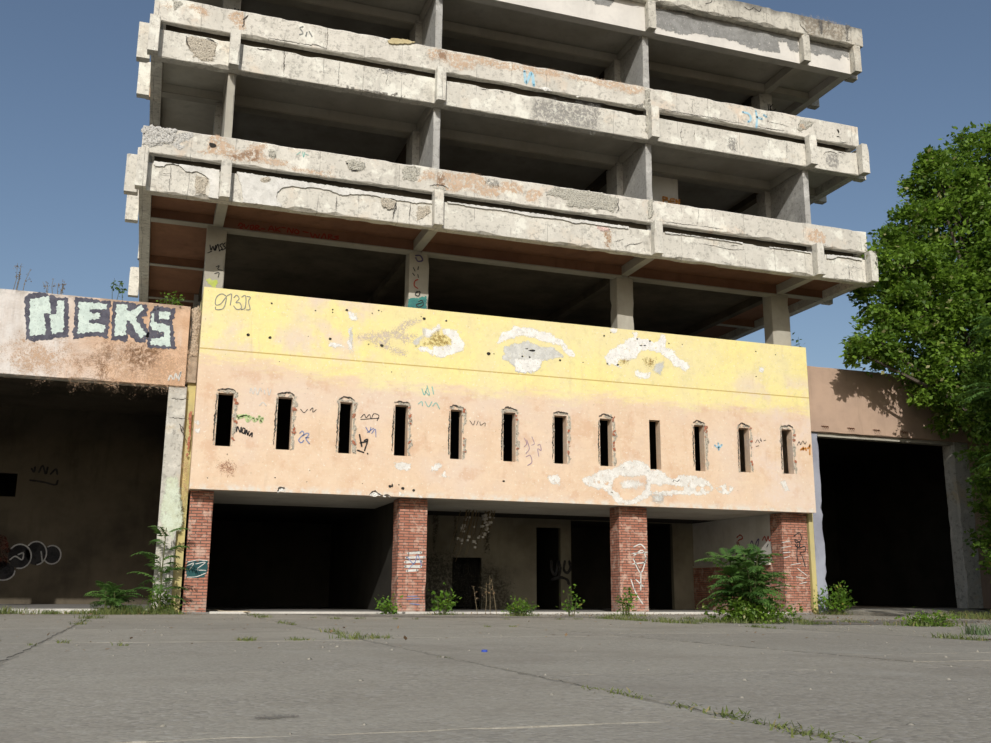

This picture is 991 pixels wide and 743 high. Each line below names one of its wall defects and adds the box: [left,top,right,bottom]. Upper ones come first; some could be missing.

spalling [186,36,218,62]
spalling [141,125,194,151]
peeling [154,161,220,199]
peeling [197,135,432,220]
spalling [402,165,629,231]
leakage [0,327,199,397]
peeling [413,323,465,358]
peeling [496,326,575,374]
peeling [604,328,690,379]
peeling [582,413,733,505]